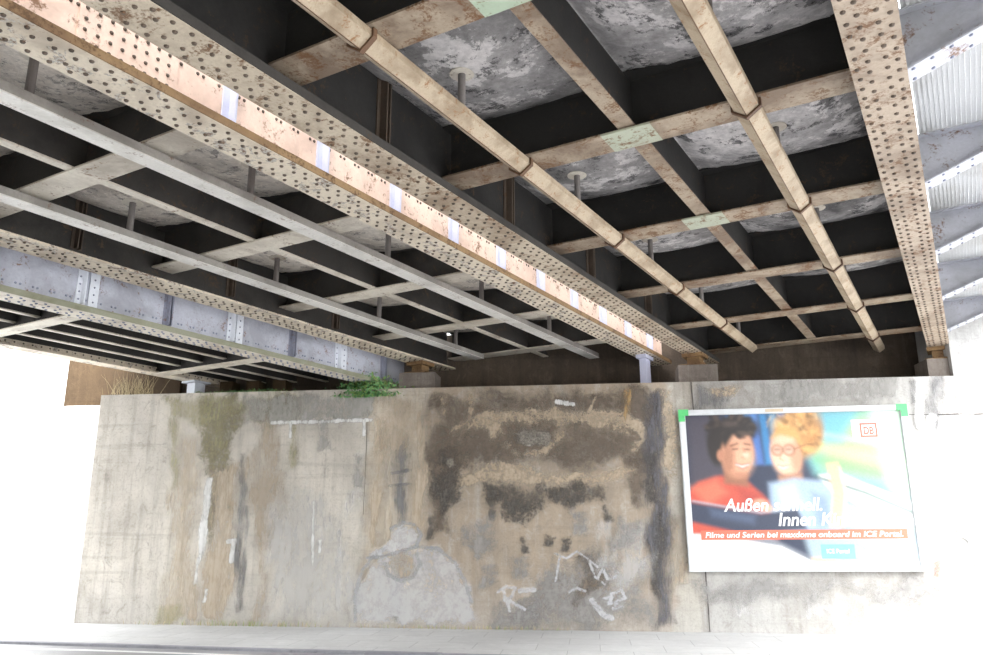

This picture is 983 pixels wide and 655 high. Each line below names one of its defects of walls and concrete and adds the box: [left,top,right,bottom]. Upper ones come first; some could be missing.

water stain [193,394,374,610]
water stain [431,390,684,625]